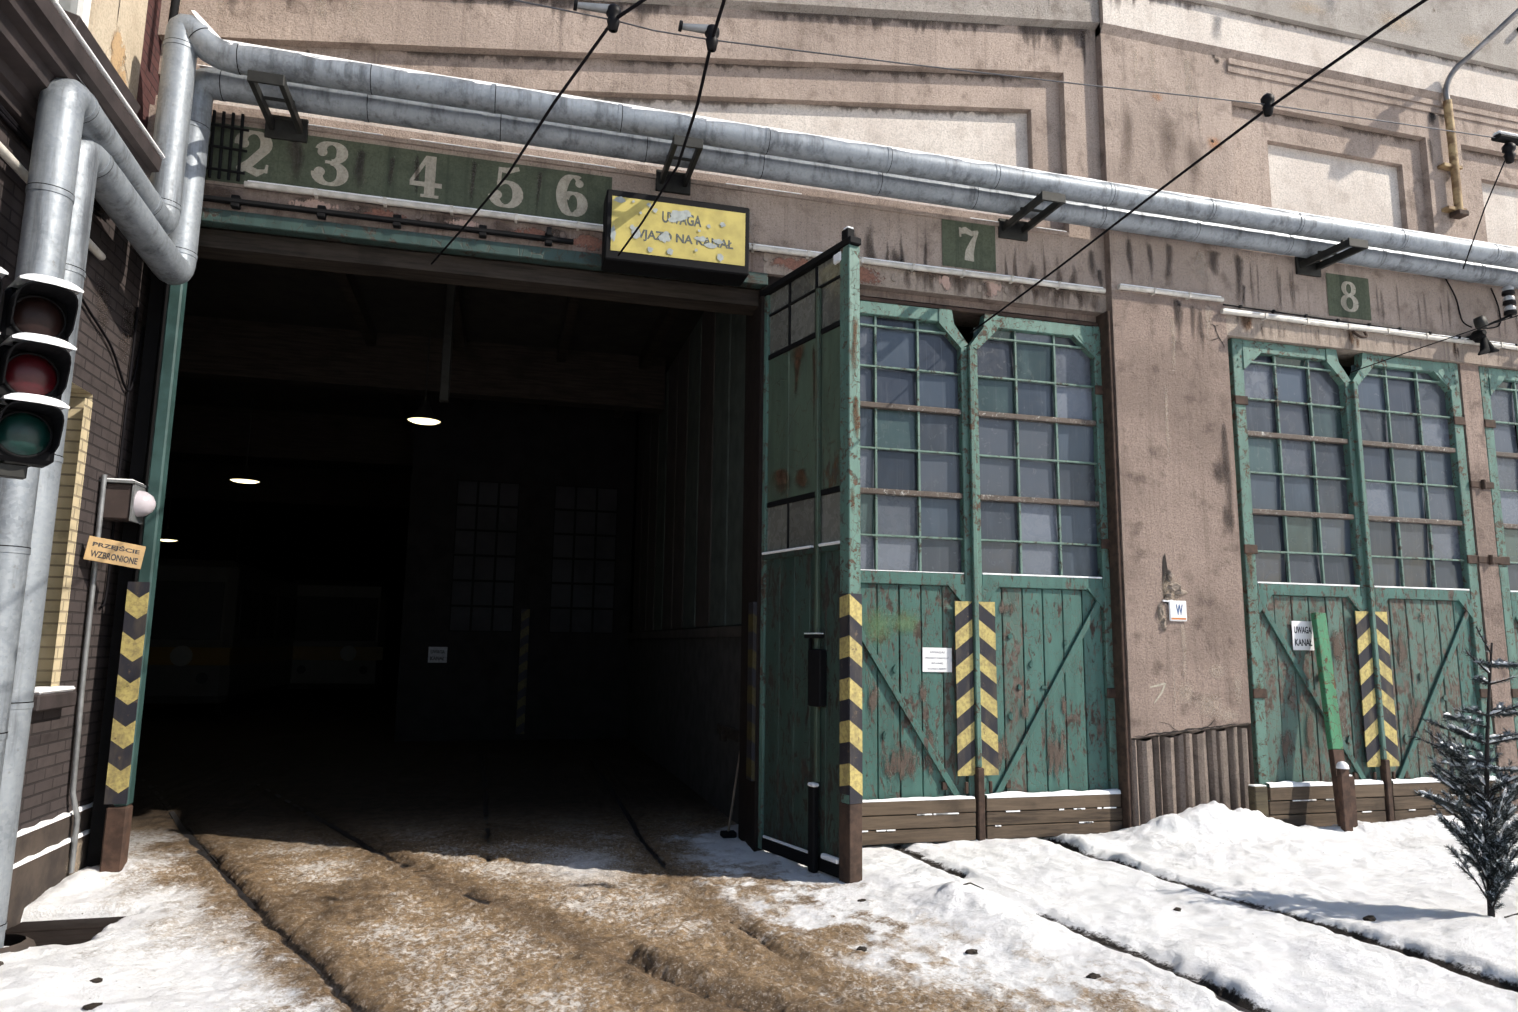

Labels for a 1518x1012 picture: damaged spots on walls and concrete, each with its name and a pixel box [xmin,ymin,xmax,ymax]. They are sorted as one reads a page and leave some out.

water stain [1239,12,1353,38]
water stain [1388,45,1512,73]
water stain [1127,241,1171,275]
water stain [1237,257,1245,301]
water stain [1174,300,1203,338]